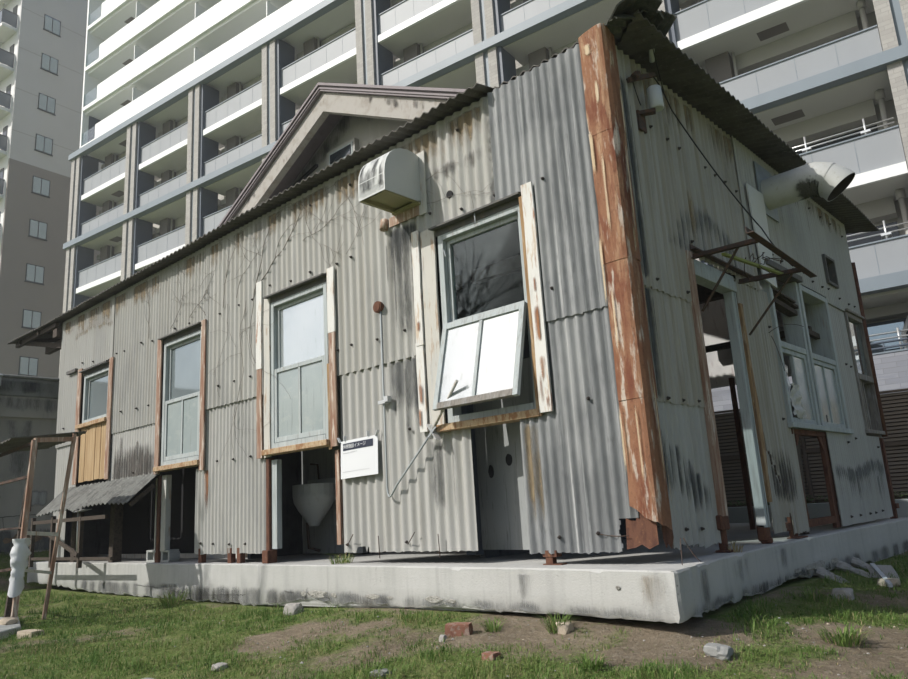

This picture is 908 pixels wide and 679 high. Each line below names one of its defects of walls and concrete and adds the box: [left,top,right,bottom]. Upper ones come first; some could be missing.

damp [386,224,416,324]
damp [663,448,707,506]
damp [192,586,304,604]
damp [316,593,359,604]